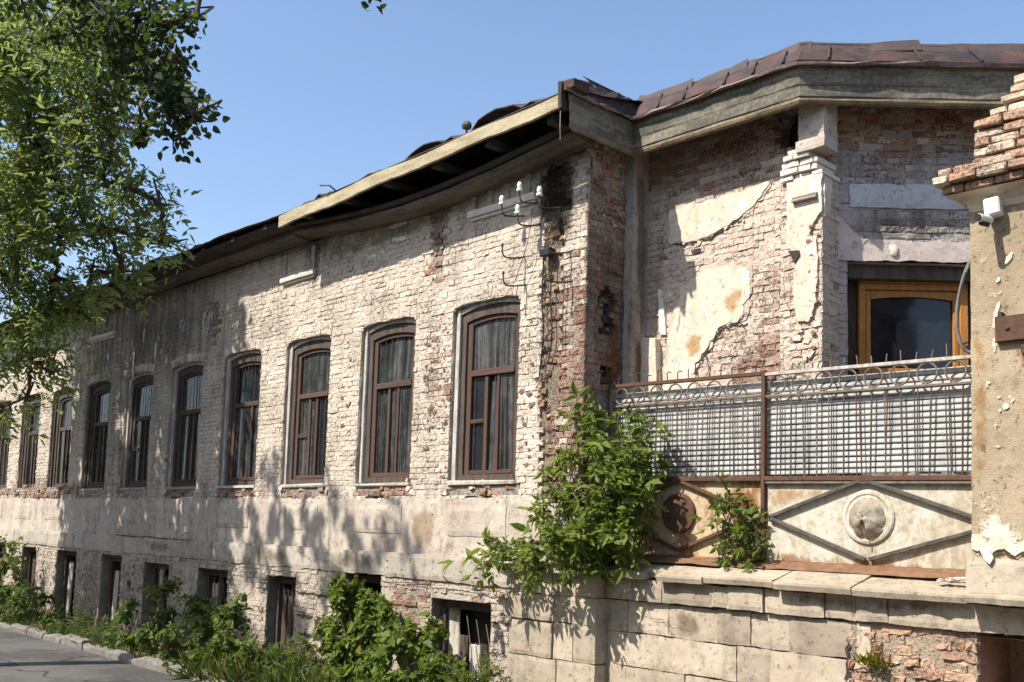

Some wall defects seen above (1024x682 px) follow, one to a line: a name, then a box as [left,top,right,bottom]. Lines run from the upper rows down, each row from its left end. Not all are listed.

spalling [837,106,991,157]
spalling [649,113,798,254]
spalling [206,299,221,338]
spalling [424,208,452,284]
peeling [640,264,754,401]
crack [691,312,747,376]
peeling [732,173,832,395]
peeling [971,495,1024,564]